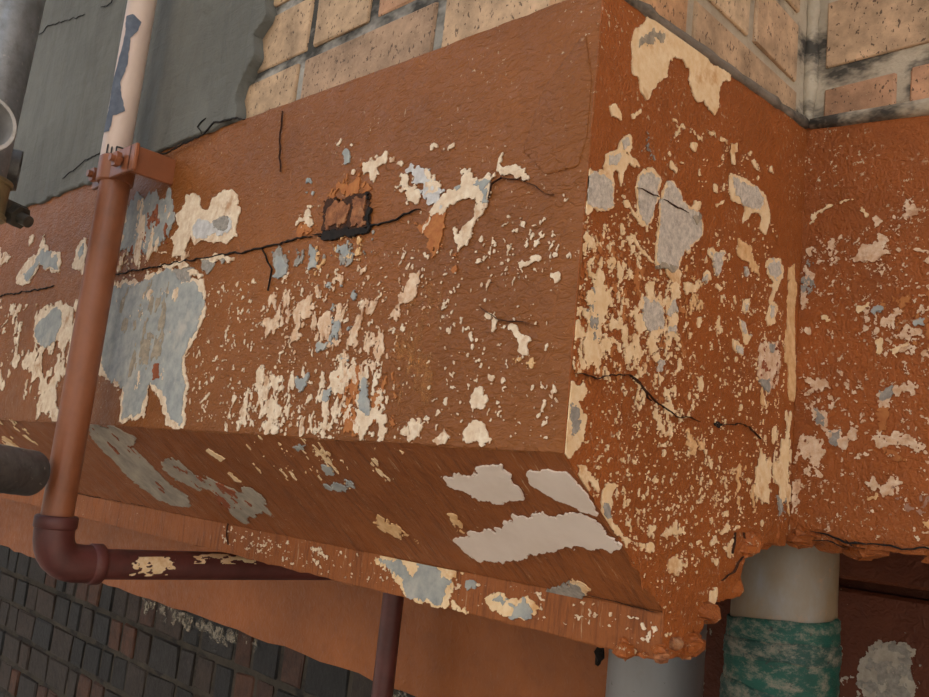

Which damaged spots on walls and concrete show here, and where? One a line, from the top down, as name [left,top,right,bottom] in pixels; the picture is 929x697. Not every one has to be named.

crack [160,117,245,155]
crack [487,177,554,199]
crack [348,209,421,230]
peeling [16,234,88,287]
crack [116,233,322,291]
peeling [89,14,929,613]
peeling [0,419,38,447]
crack [579,373,762,439]
crack [811,531,929,550]
peeling [366,556,598,625]
spalling [612,587,721,664]
peeling [840,640,922,697]